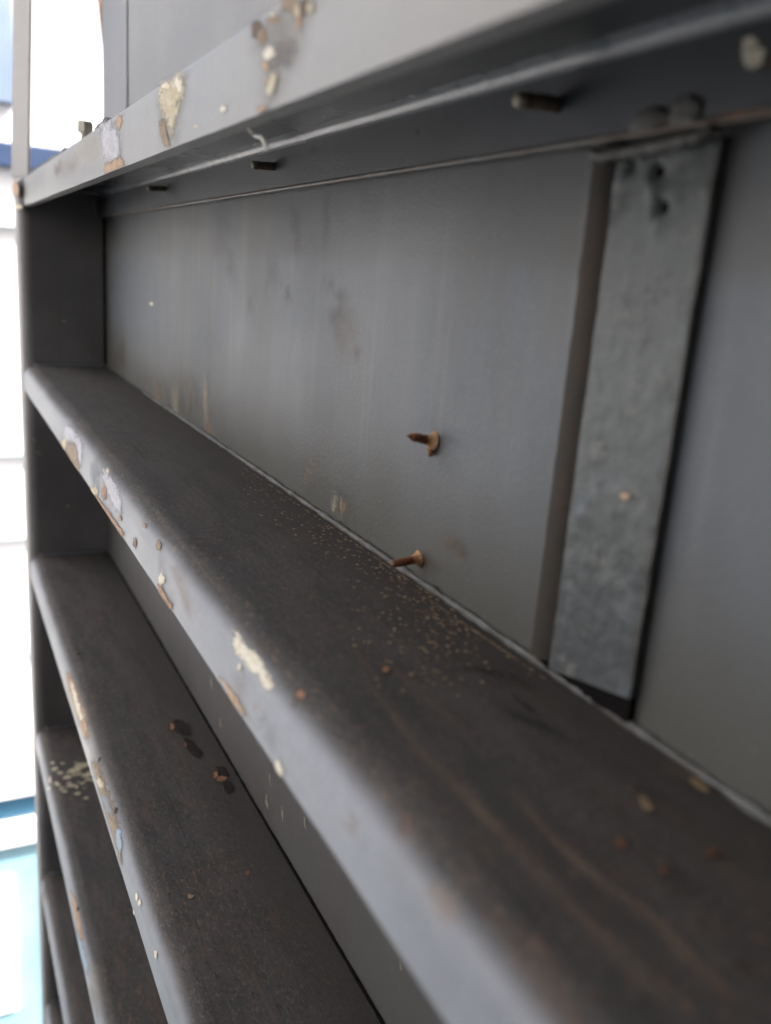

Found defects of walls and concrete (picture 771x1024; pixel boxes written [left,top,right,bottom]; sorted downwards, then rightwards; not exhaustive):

peeling [251,0,313,112]
peeling [100,115,126,173]
peeling [158,71,185,147]
peeling [60,423,83,470]
peeling [90,468,146,548]
corrosion [244,468,546,696]
peeling [219,677,245,717]
peeling [232,629,274,694]
peeling [48,757,123,869]